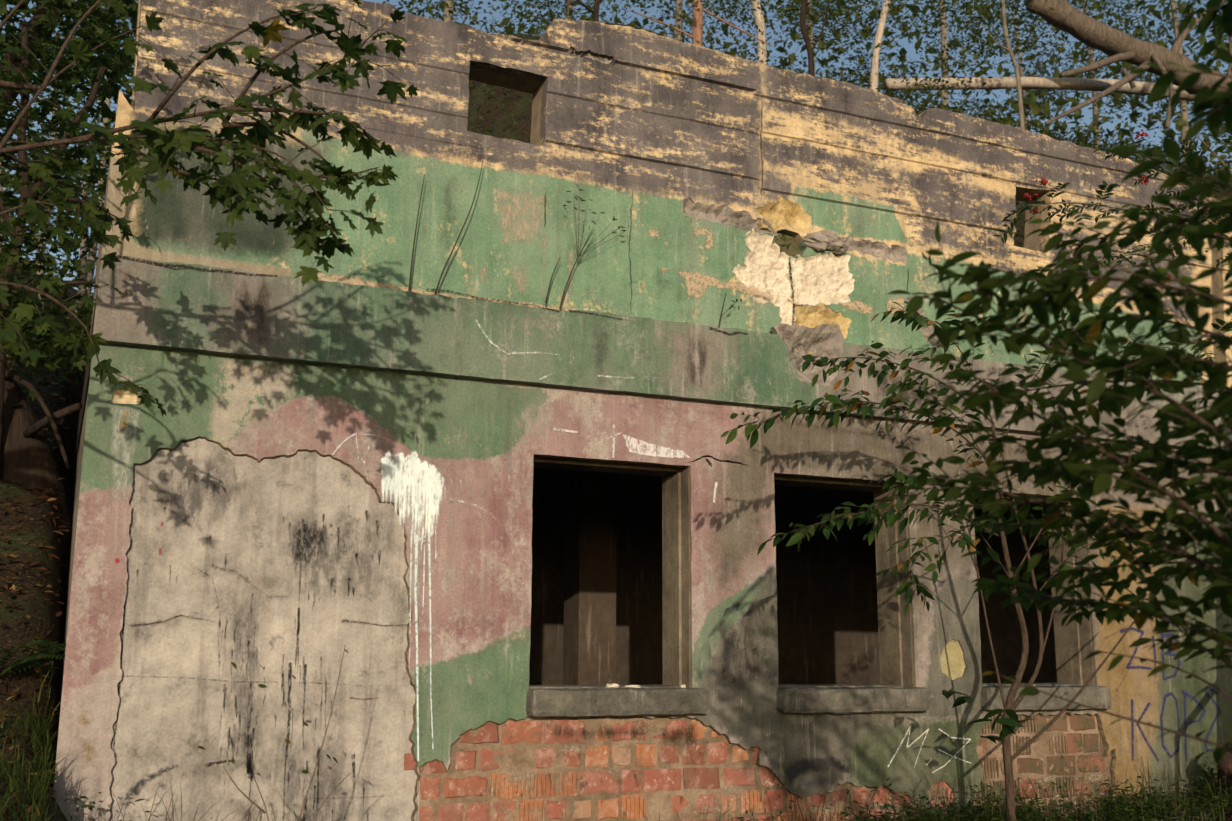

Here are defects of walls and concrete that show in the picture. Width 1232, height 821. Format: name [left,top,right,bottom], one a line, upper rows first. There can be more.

spalling [661,196,949,387]
water stain [122,766,173,806]
water stain [206,665,257,796]
water stain [275,514,358,821]
spalling [108,436,953,821]
spalling [969,712,1116,821]